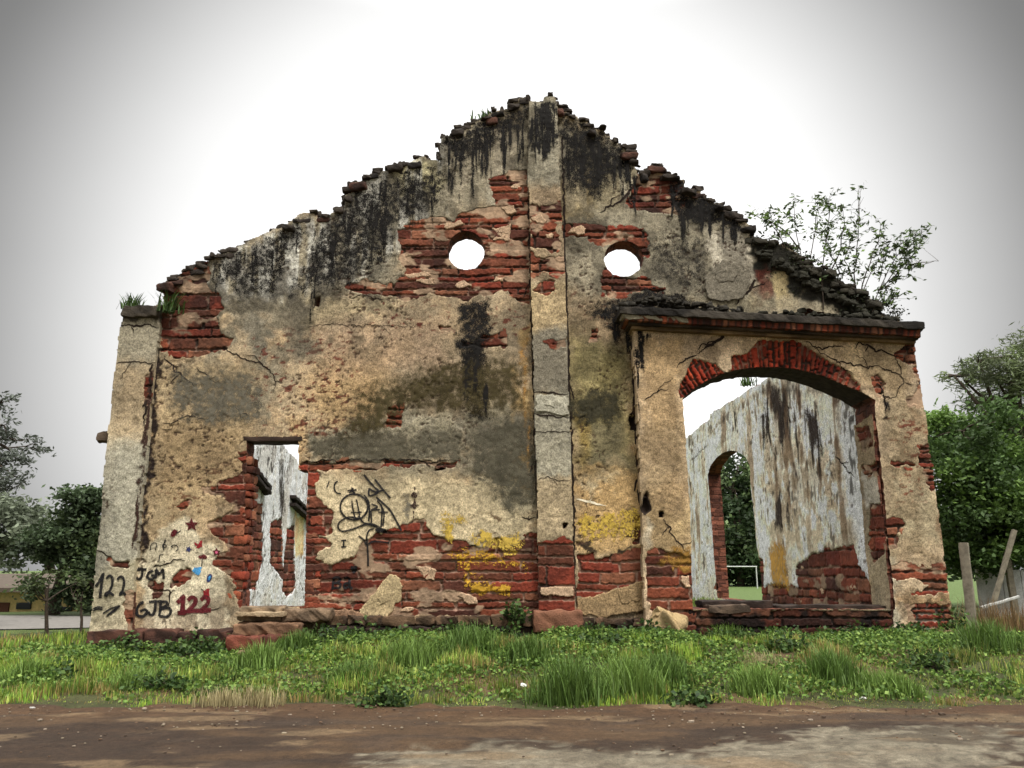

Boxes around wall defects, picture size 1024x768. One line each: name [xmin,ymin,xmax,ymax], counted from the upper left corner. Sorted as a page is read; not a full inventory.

crack [121,324,156,334]
spalling [160,261,233,359]
crack [226,349,282,394]
leakage [306,298,537,514]
leakage [209,100,637,327]
spalling [345,170,650,304]
crack [522,136,577,606]
spalling [600,267,666,299]
leakage [755,382,824,472]
crack [806,341,913,411]
spalling [201,451,954,635]
leakage [769,486,790,591]